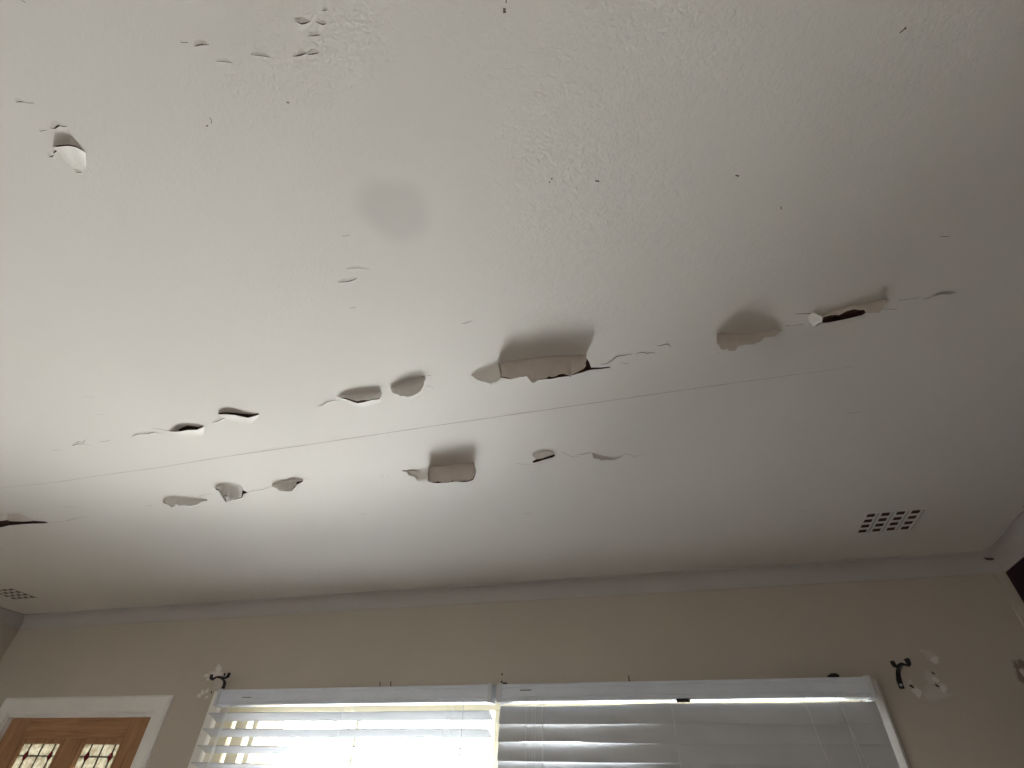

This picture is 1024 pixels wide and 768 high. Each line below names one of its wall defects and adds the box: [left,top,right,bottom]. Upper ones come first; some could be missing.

peeling [47,145,86,170]
peeling [717,297,921,354]
crack [601,341,671,365]
peeling [472,355,610,386]
peeling [317,374,434,407]
peeling [169,412,259,438]
peeling [517,451,644,465]
peeling [404,463,476,484]
peeling [146,478,309,508]
peeling [0,513,86,529]